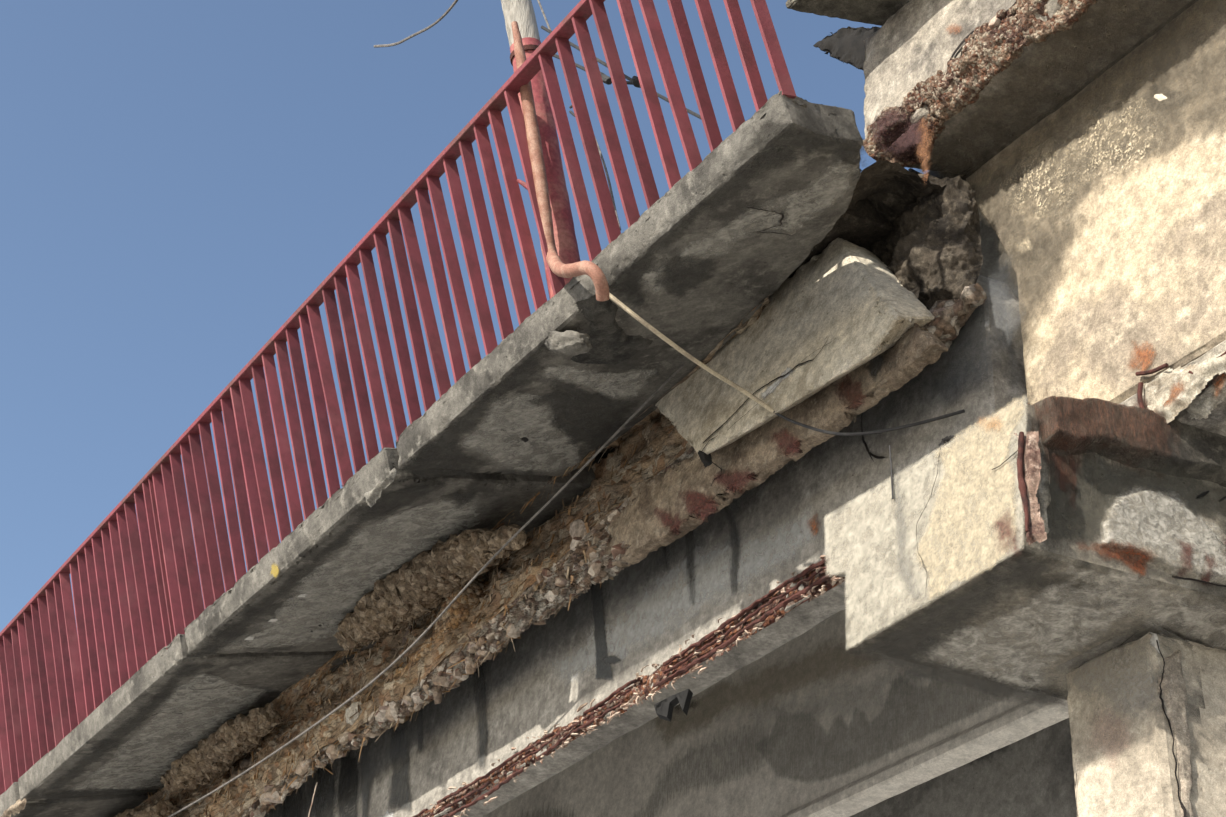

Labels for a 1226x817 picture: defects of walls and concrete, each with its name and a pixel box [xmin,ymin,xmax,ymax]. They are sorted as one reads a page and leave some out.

damp [610,123,865,306]
spalling [863,0,1096,310]
damp [820,0,1226,454]
spalling [364,468,396,508]
rust [413,555,846,817]
spalling [698,450,712,468]
damp [264,398,1226,817]
rust [1027,386,1183,484]
rust [1095,543,1152,575]
crack [1156,640,1187,817]
spalling [1135,351,1226,423]
crack [1172,575,1226,587]